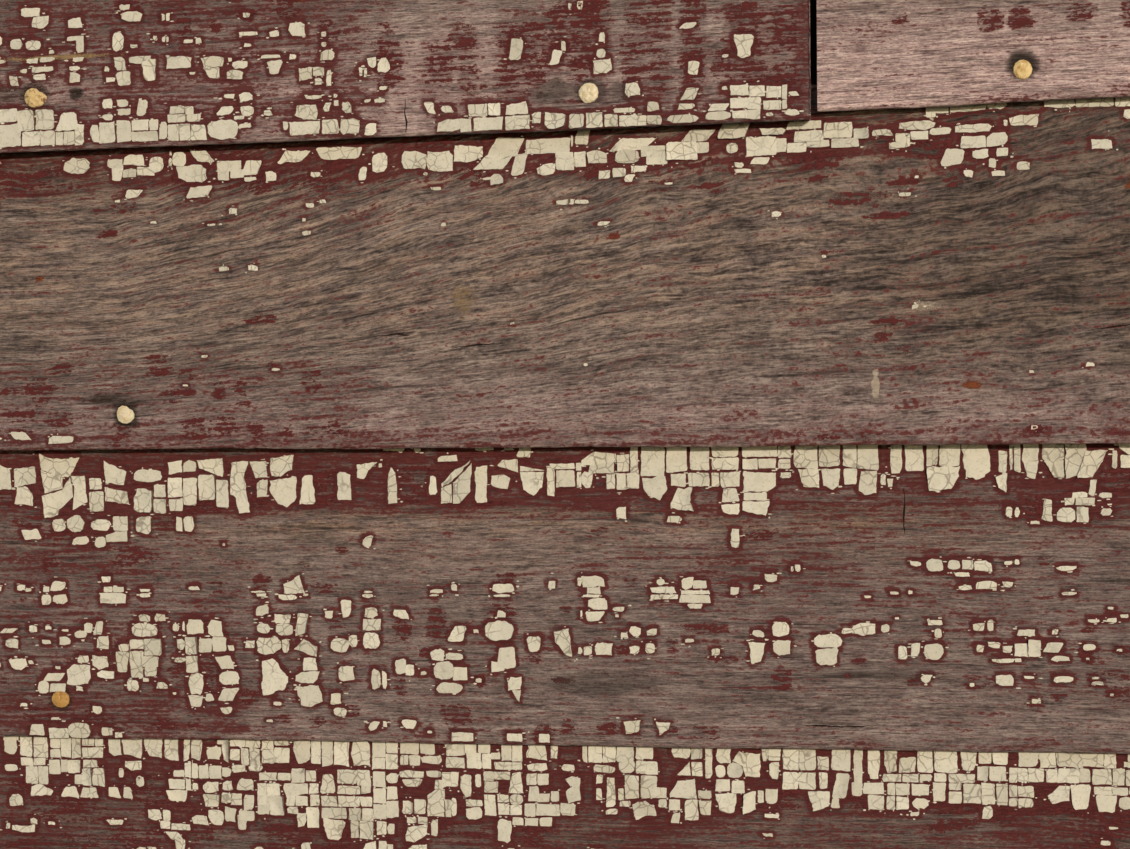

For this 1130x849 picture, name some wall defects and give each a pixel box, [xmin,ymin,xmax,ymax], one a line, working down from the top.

peeling [0,4,1130,202]
peeling [0,432,316,548]
peeling [337,448,424,504]
peeling [421,443,1130,524]
peeling [577,572,632,623]
peeling [646,576,711,609]
peeling [910,556,1020,591]
peeling [0,573,412,718]
peeling [371,581,657,701]
peeling [746,622,797,664]
peeling [811,617,899,667]
peeling [968,620,1096,689]